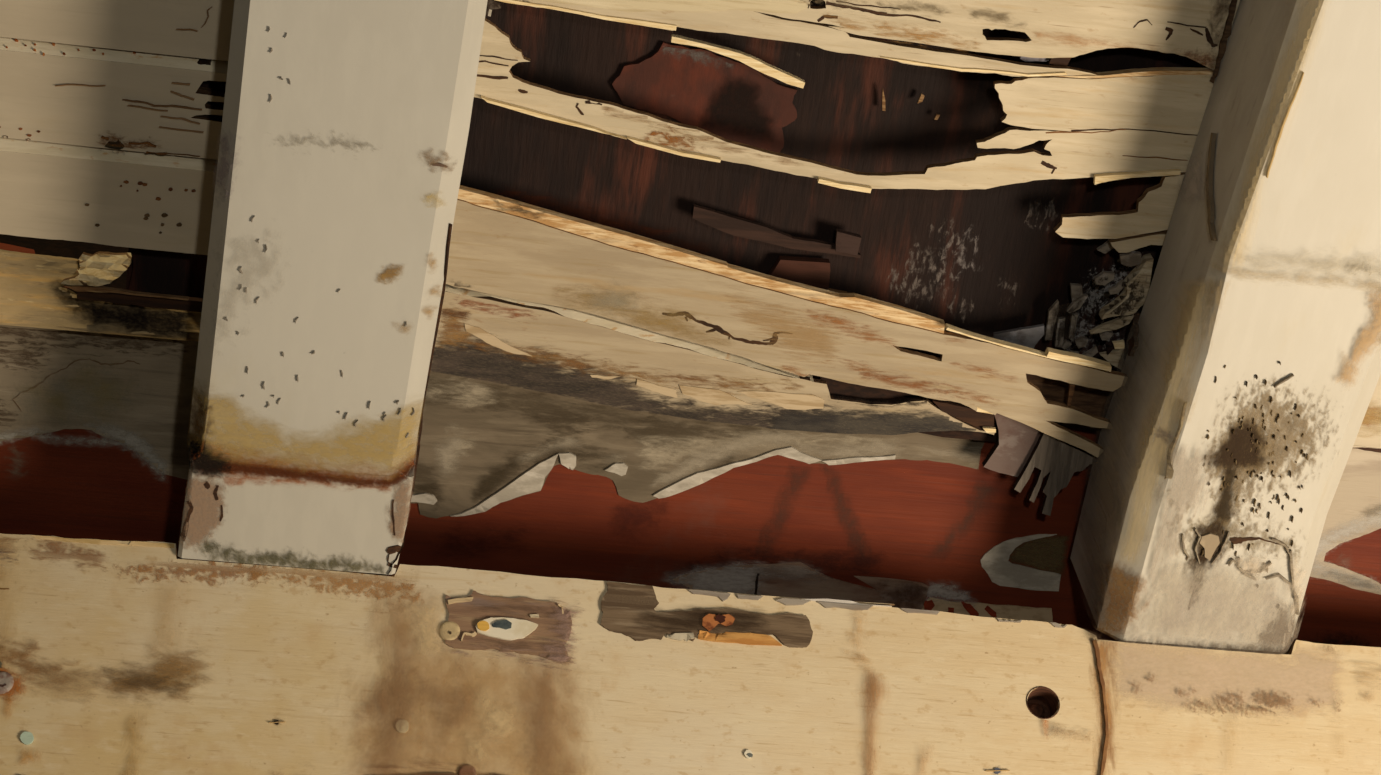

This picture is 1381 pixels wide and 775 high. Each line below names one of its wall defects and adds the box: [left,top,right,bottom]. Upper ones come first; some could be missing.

water stain [1250,0,1317,186]
water stain [1205,133,1218,241]
crack [662,311,793,345]
peeling [1044,240,1141,368]
water stain [190,390,417,468]
peeling [0,325,985,602]
water stain [1096,285,1329,635]
peeling [1310,448,1381,595]
peeling [445,590,578,662]
spalling [600,534,1067,648]